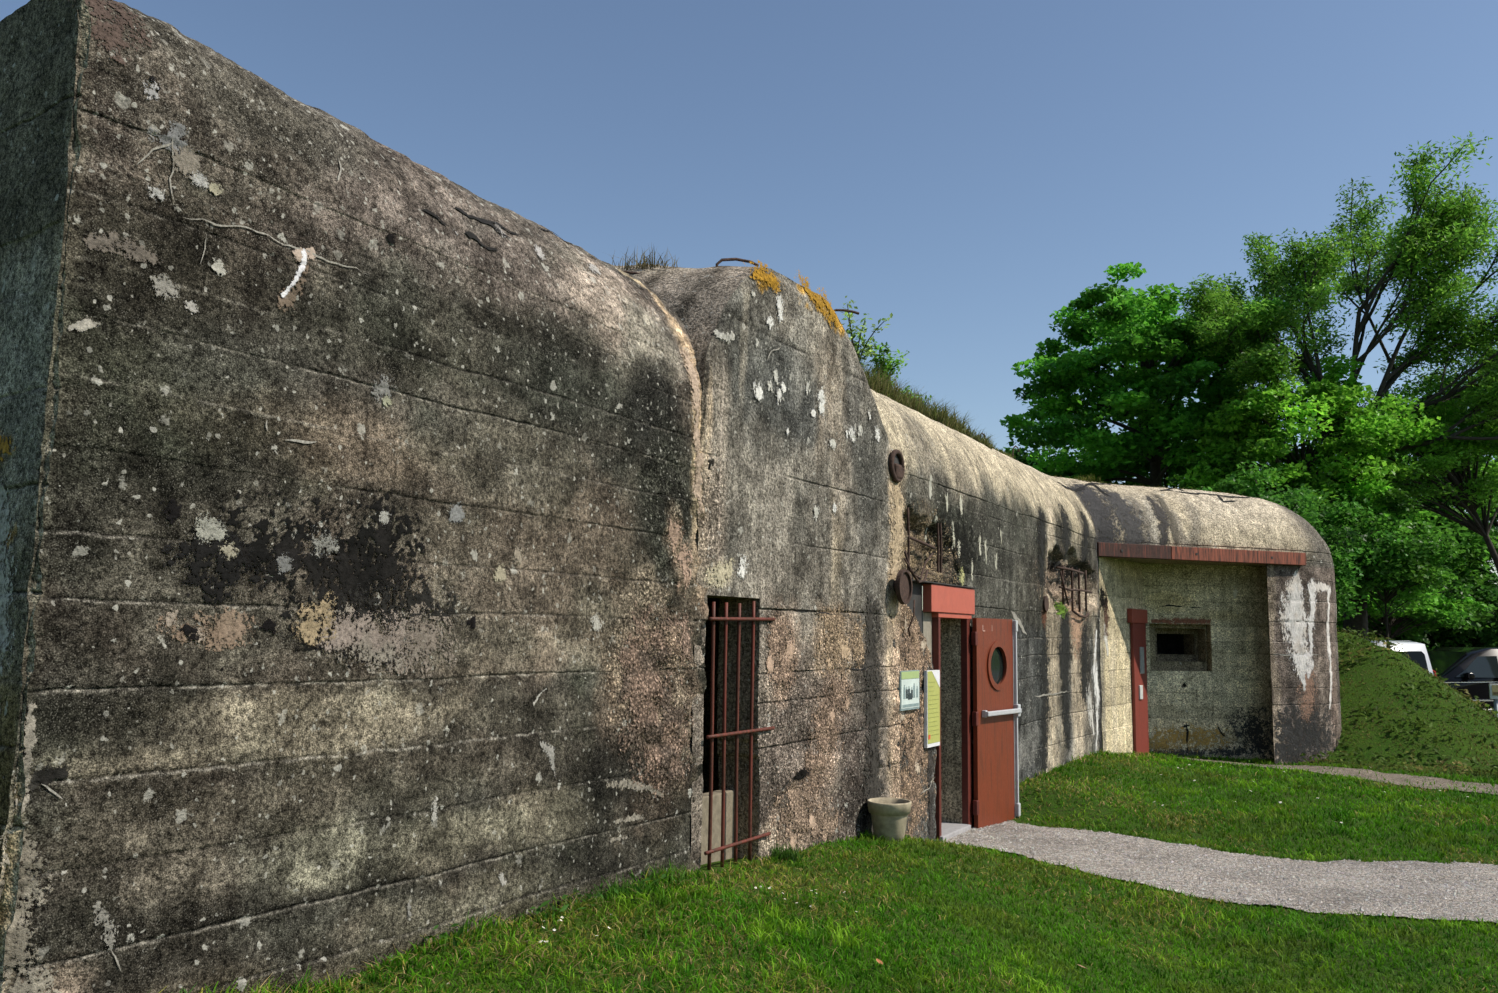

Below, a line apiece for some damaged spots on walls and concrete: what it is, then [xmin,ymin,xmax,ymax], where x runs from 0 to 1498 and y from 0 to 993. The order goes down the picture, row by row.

crack [138,120,364,273]
mould [161,483,471,670]
peeling [1278,570,1333,709]